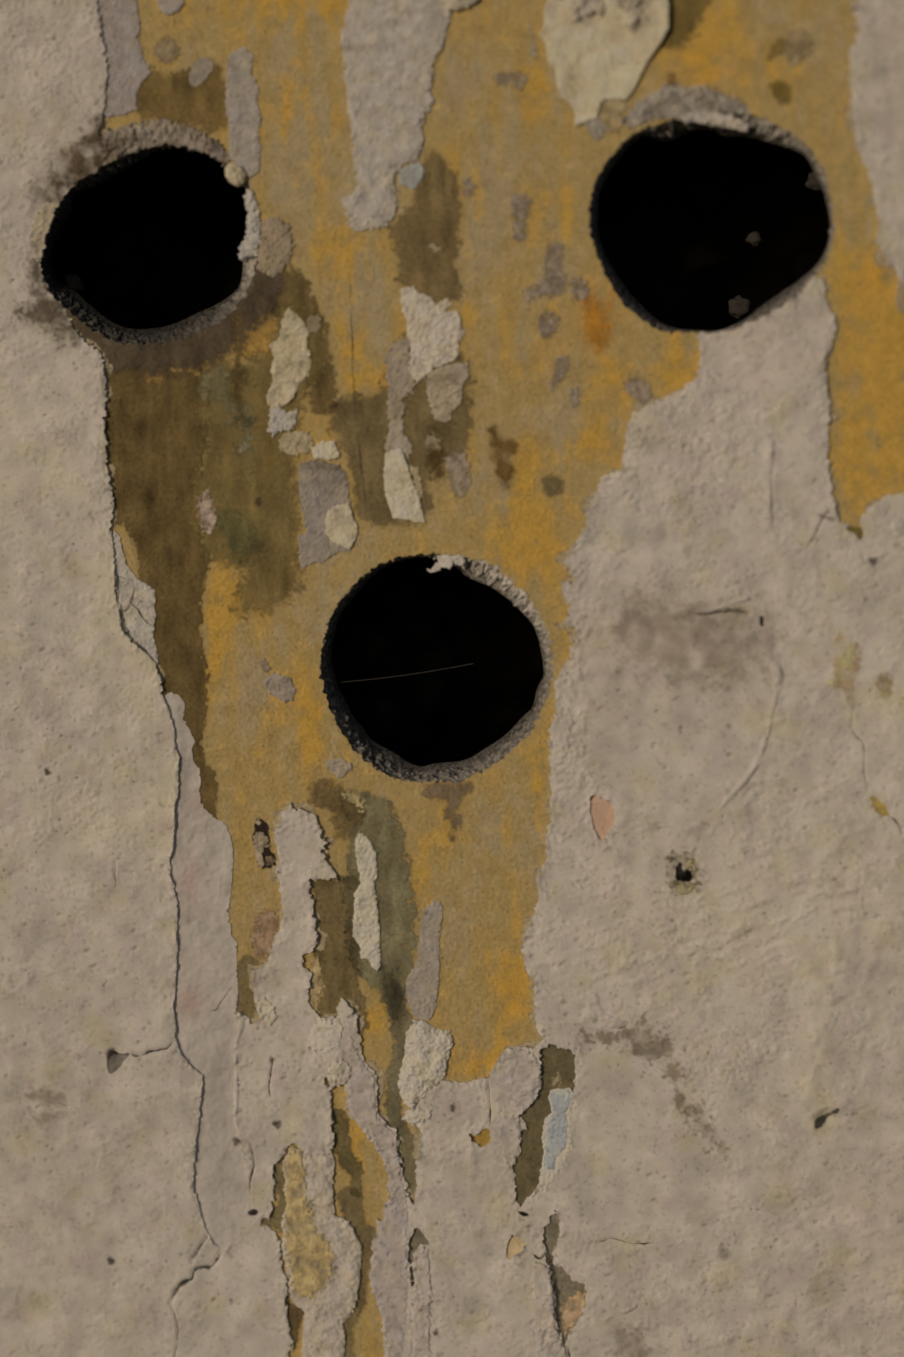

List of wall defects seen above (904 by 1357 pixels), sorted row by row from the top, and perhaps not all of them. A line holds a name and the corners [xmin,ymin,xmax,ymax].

crack [114,573,153,661]
peeling [84,0,904,1194]
crack [131,1045,171,1057]
crack [171,1235,220,1357]
peeling [260,1037,432,1357]
peeling [506,1235,526,1259]
peeling [530,1210,587,1357]